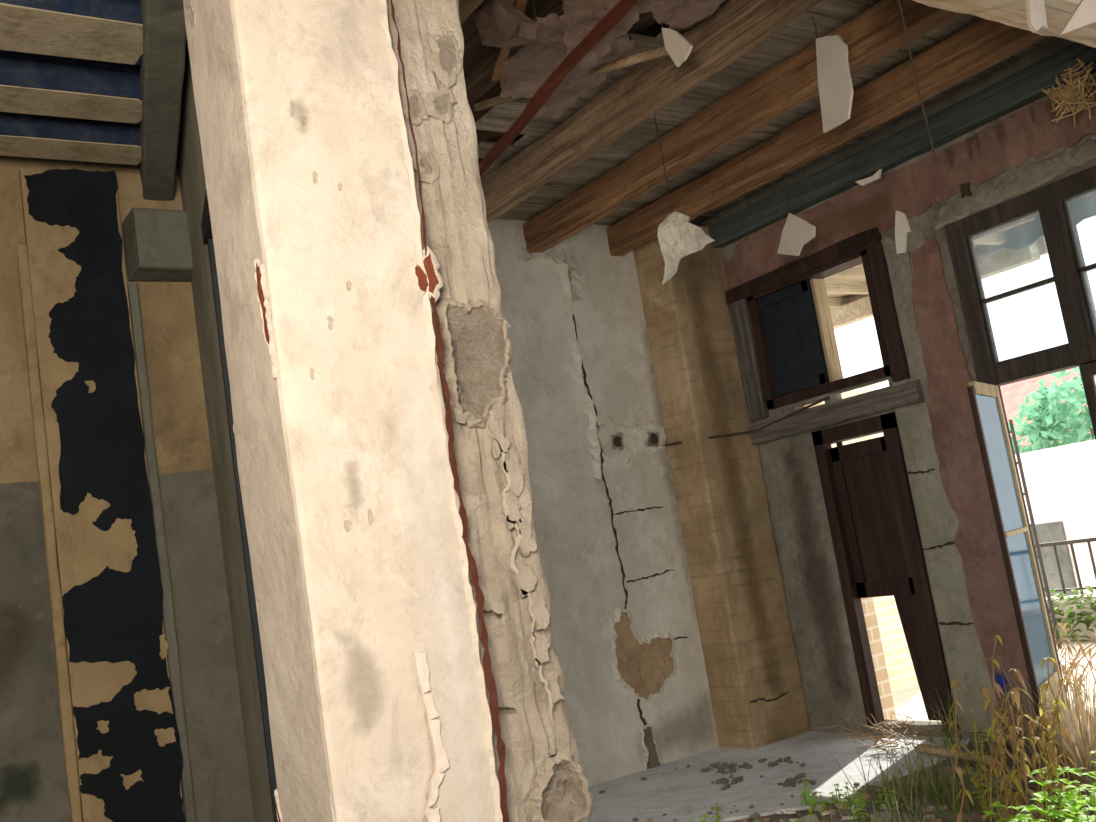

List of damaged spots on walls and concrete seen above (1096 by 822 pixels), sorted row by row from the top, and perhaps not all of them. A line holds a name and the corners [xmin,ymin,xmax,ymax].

peeling [24,168,186,822]
spalling [409,246,565,727]
spalling [529,750,594,822]
crack [556,264,675,615]
crack [635,692,648,727]
spalling [609,606,677,703]